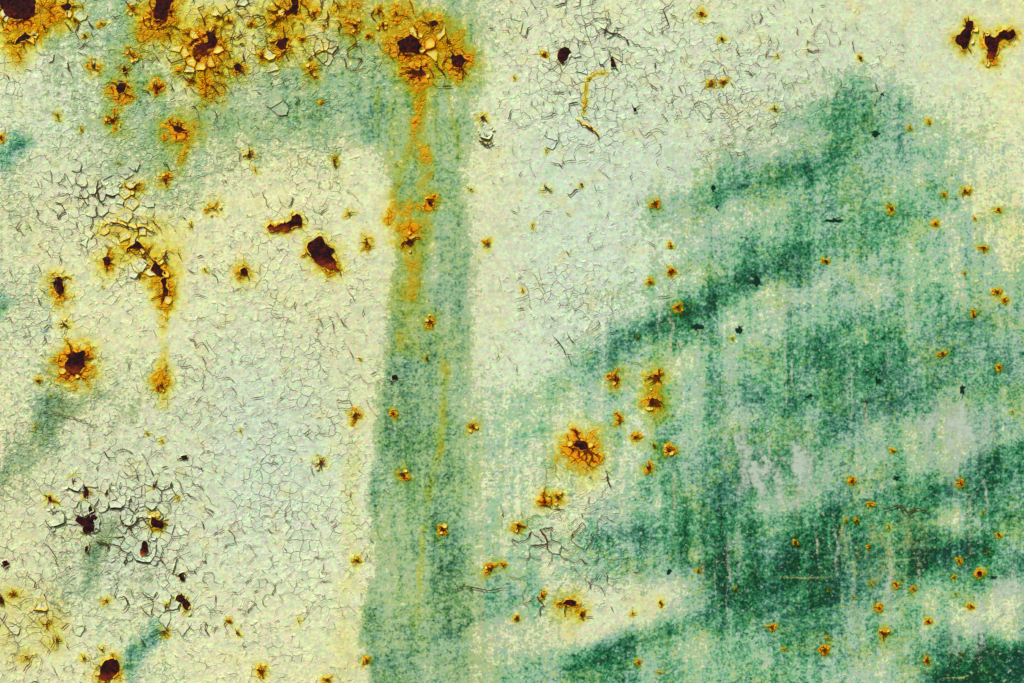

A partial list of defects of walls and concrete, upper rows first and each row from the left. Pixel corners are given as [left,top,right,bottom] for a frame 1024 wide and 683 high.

rust [300,0,468,54]
rust [147,77,166,97]
crack [0,0,884,445]
rust [384,193,441,300]
rust [150,365,170,392]
rust [606,368,621,389]
rust [640,368,667,417]
peeling [64,476,86,492]
peeling [44,503,64,531]
peeling [104,485,160,528]
peeling [127,534,161,565]
crack [0,446,379,683]